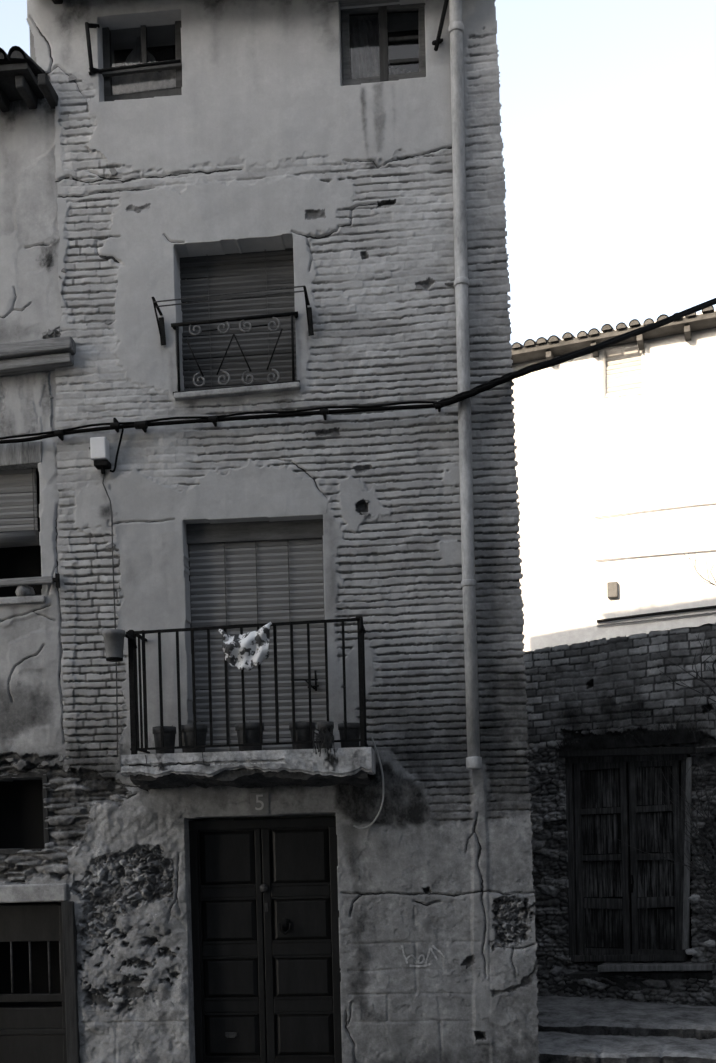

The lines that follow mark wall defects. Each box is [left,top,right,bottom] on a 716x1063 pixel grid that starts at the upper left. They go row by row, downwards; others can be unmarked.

peeling [42,73,118,339]
spalling [126,202,151,213]
spalling [305,208,326,219]
spalling [377,198,397,207]
spalling [415,277,437,291]
crack [1,510,65,741]
peeling [0,527,186,1021]
damp [324,753,338,771]
damp [335,759,428,826]
crack [343,814,534,976]
spalling [488,892,536,951]
crack [345,1003,356,1059]